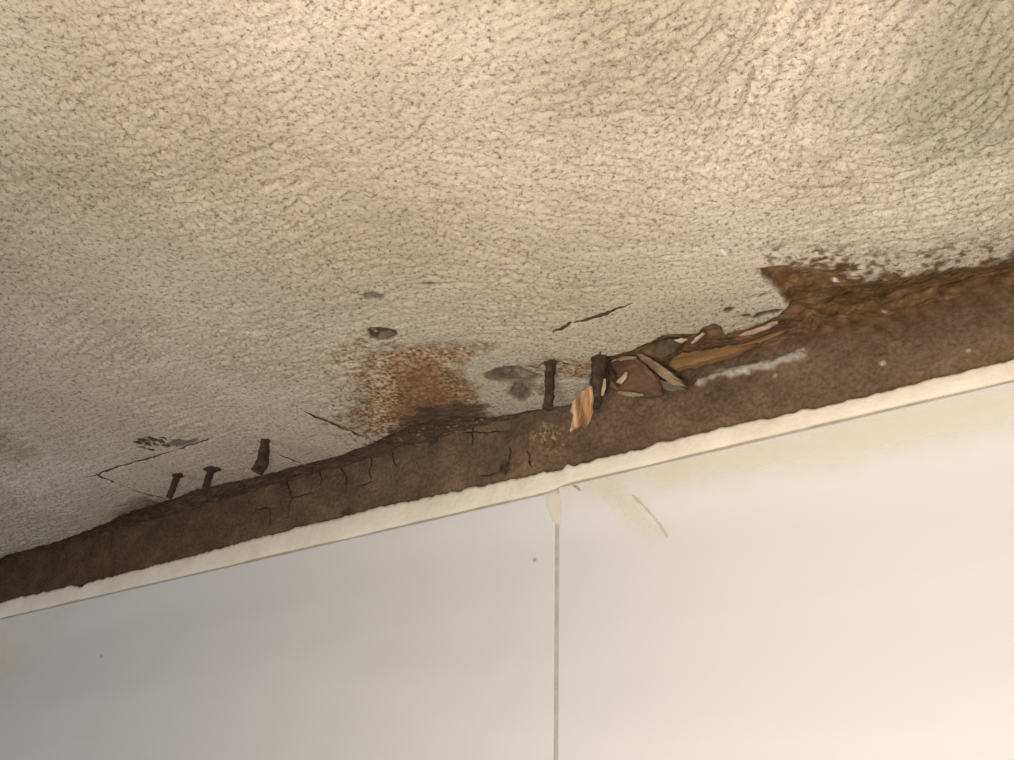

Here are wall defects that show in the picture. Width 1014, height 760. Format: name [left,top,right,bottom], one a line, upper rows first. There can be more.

spalling [368,327,397,339]
crack [552,303,633,332]
spalling [605,303,830,392]
corrosion [329,339,502,445]
peeling [485,366,545,400]
spalling [134,436,170,451]
crack [83,438,211,499]